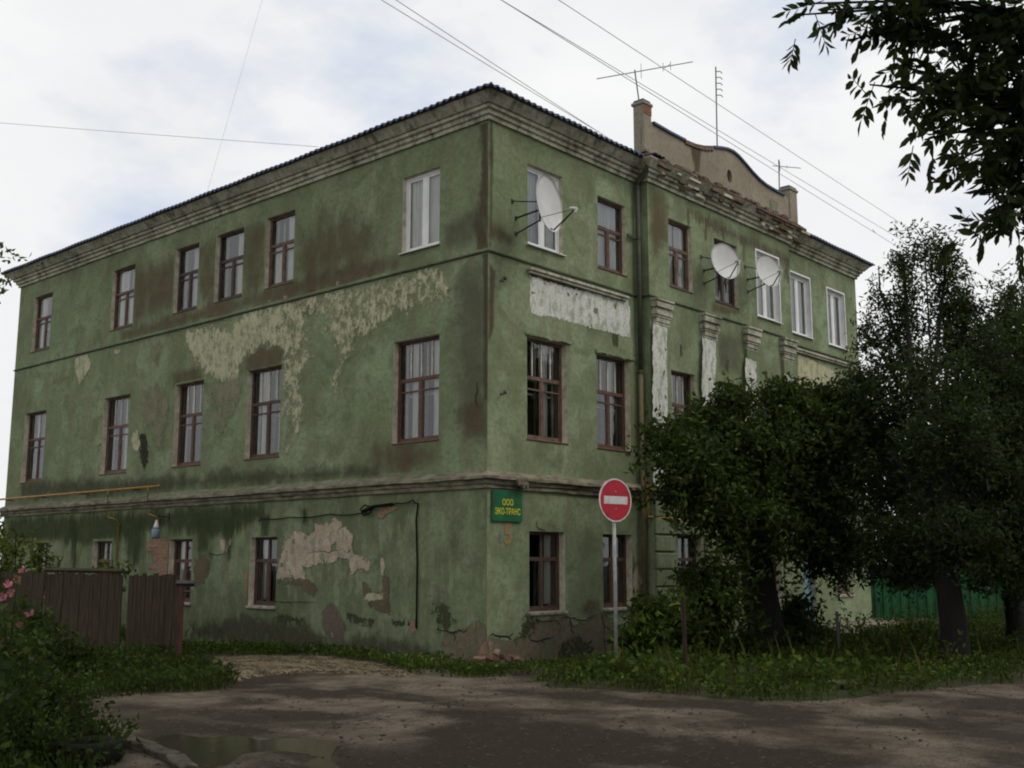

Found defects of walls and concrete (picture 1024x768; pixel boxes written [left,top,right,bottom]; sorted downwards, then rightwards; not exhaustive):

flaking render [640,148,810,245]
peeling [530,275,630,337]
peeling [73,354,91,384]
peeling [185,268,451,453]
peeling [652,323,668,440]
peeling [702,337,717,406]
peeling [745,358,757,403]
peeling [276,517,391,617]
crack [438,615,610,651]